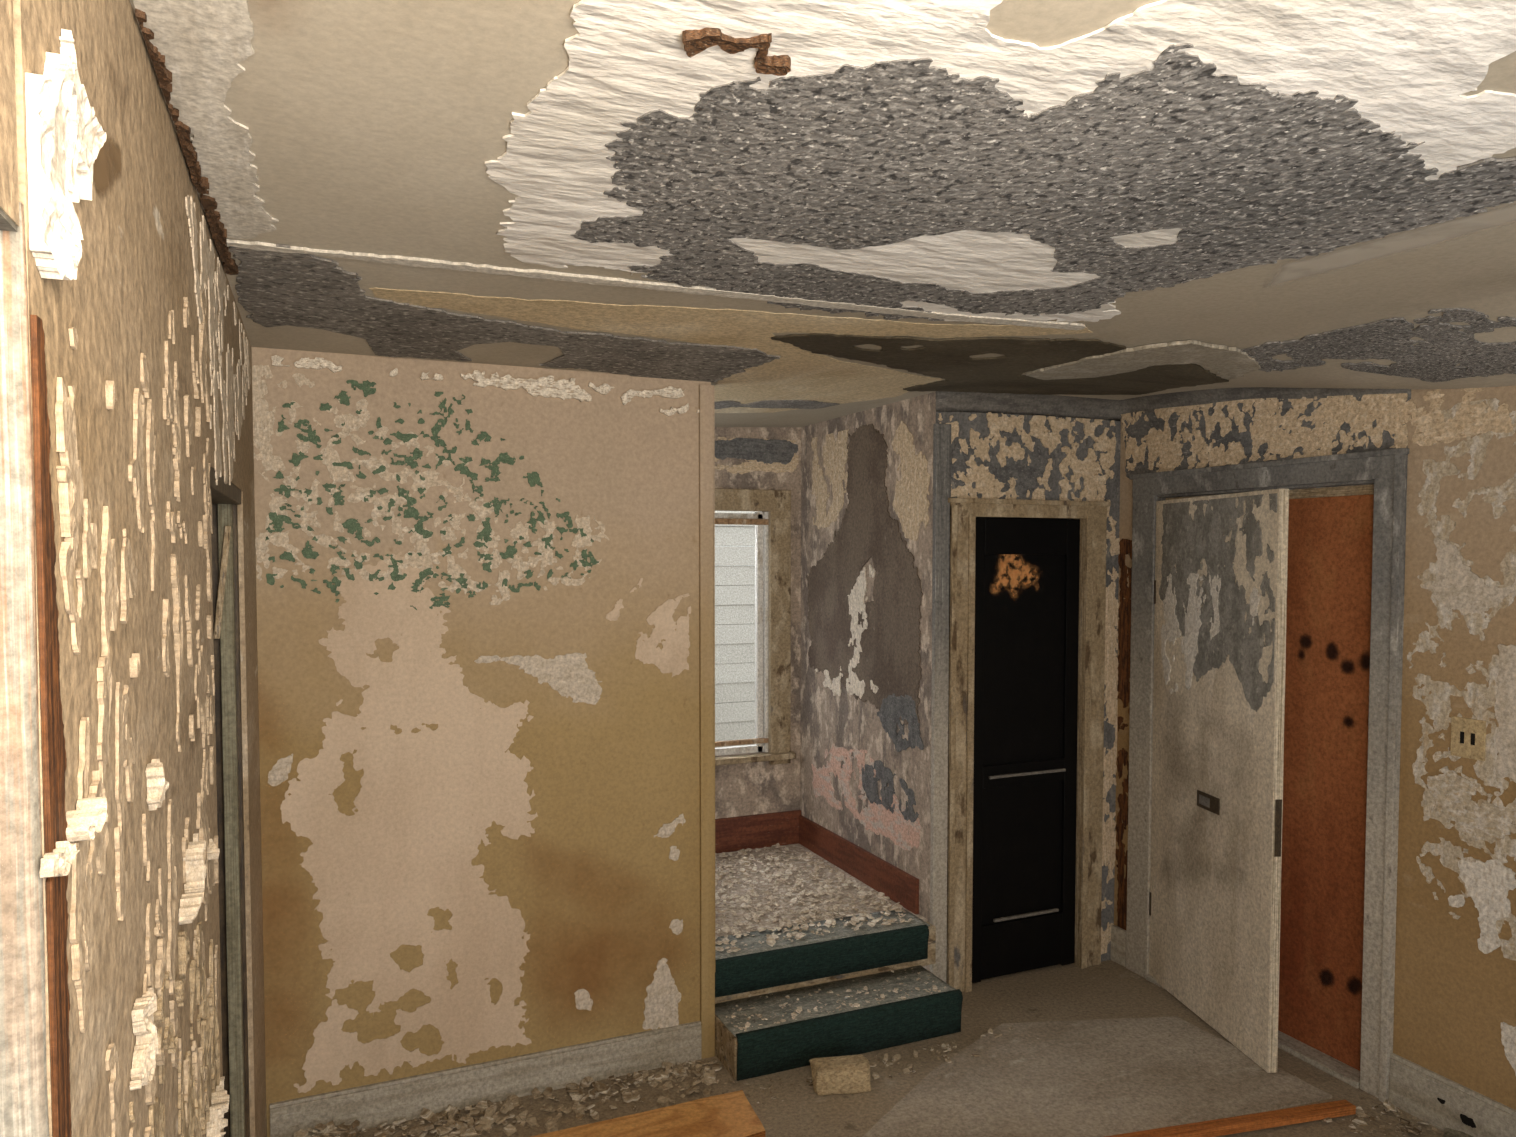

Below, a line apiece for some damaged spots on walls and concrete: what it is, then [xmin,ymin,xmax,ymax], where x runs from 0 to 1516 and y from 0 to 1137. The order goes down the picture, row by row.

spalling [570,27,1516,321]
spalling [714,400,840,409]
peeling [39,195,780,1137]
peeling [715,421,930,851]
spalling [771,308,1516,960]
peeling [1460,1114,1476,1128]
peeling [1501,1022,1516,1075]